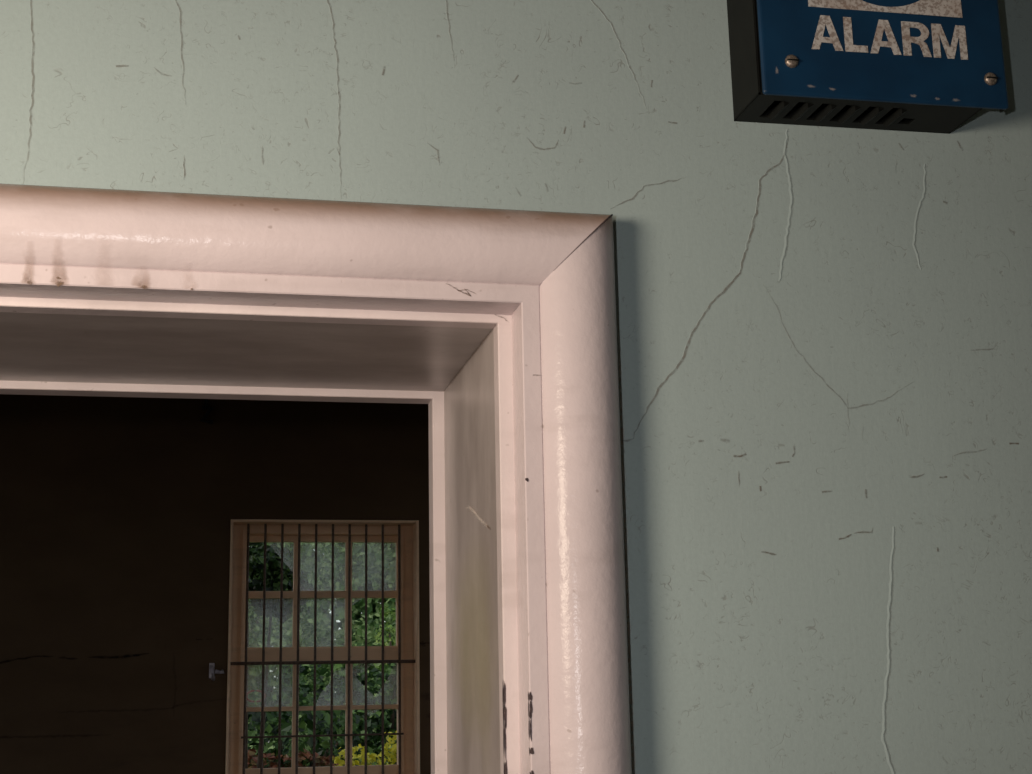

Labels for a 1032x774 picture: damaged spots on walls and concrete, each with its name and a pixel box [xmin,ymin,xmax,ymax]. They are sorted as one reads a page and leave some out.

crack [22,0,33,183]
crack [564,180,676,260]
crack [632,163,779,436]